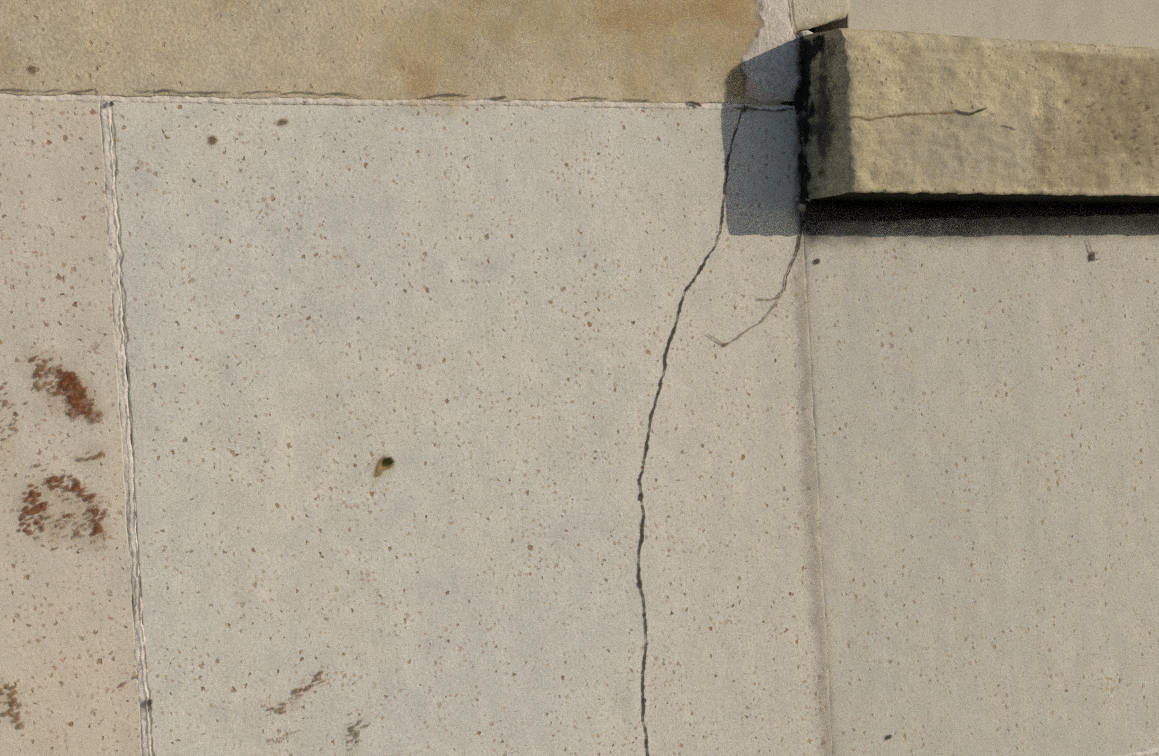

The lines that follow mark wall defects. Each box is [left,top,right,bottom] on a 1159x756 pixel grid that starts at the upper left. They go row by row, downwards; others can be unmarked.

crack [143,88,357,96]
crack [421,92,507,100]
crack [573,95,650,103]
corrosion [31,355,103,423]
crack [638,105,804,756]
corrosion [18,463,107,550]